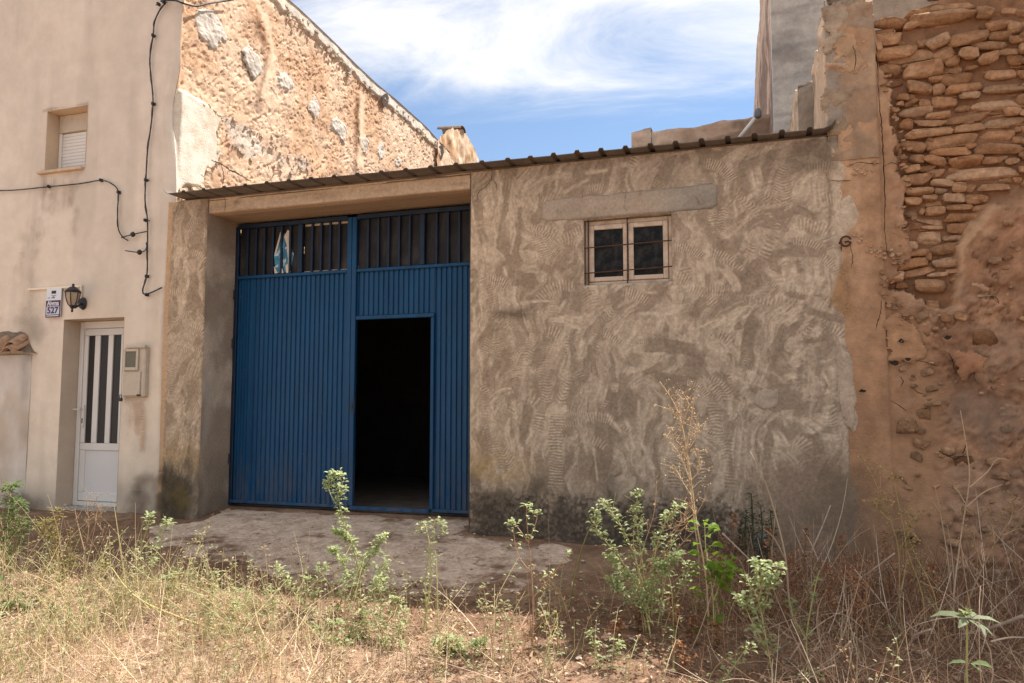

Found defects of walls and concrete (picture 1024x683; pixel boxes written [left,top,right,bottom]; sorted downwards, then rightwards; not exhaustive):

crack [831,48,899,254]
spalling [883,312,927,367]
spalling [942,335,988,380]
water stain [133,470,190,520]
water stain [476,500,748,556]